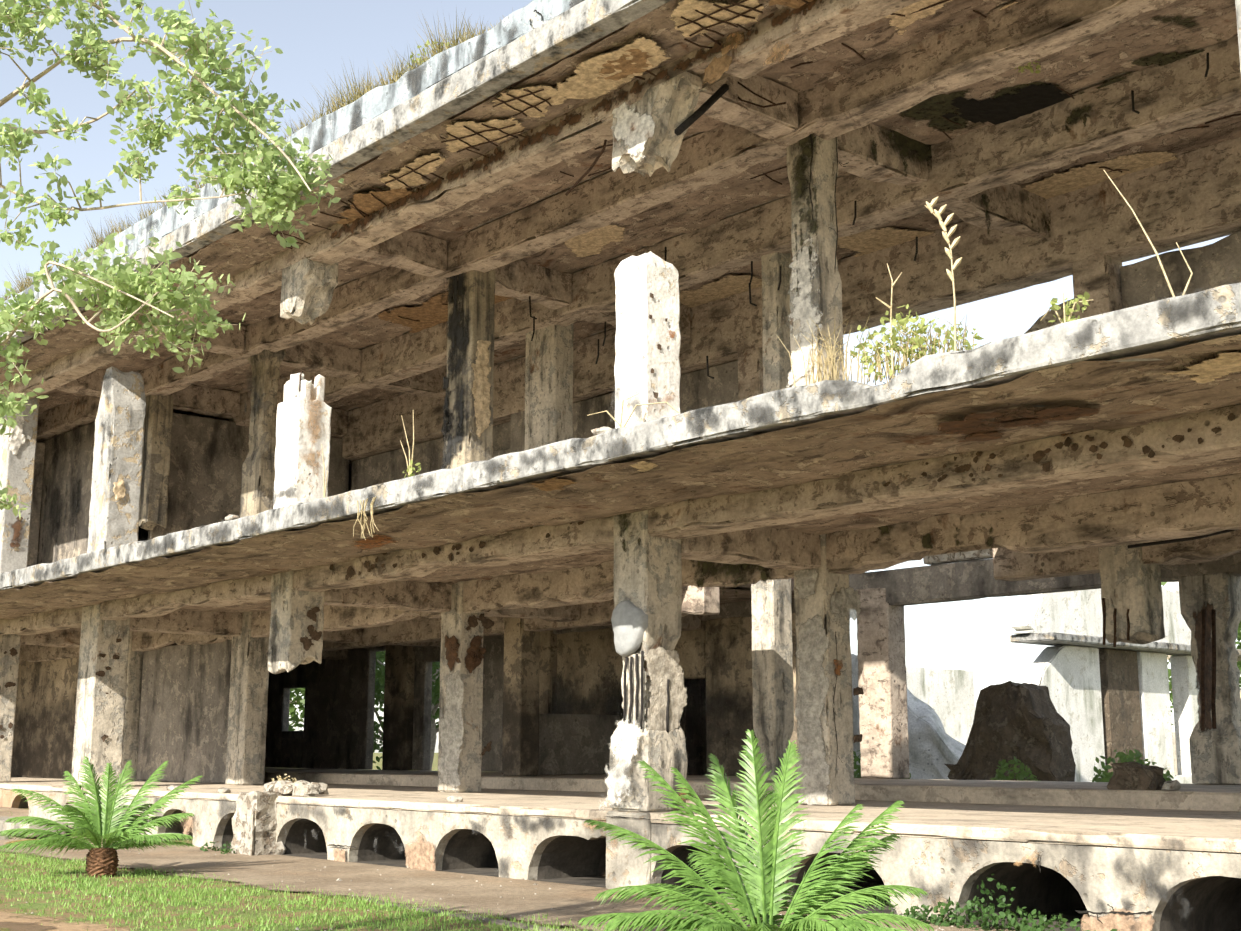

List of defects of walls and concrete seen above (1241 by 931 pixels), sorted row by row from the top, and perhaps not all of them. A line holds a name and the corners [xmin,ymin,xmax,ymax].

spalling [670,0,813,136]
spalling [312,37,671,230]
peeling [899,89,970,140]
damp [1158,291,1199,325]
damp [965,341,1006,373]
damp [1075,324,1092,346]
damp [412,273,470,494]
damp [820,379,856,401]
damp [748,404,774,423]
spalling [300,607,322,651]
corrosion [445,635,486,673]
spalling [583,647,687,829]